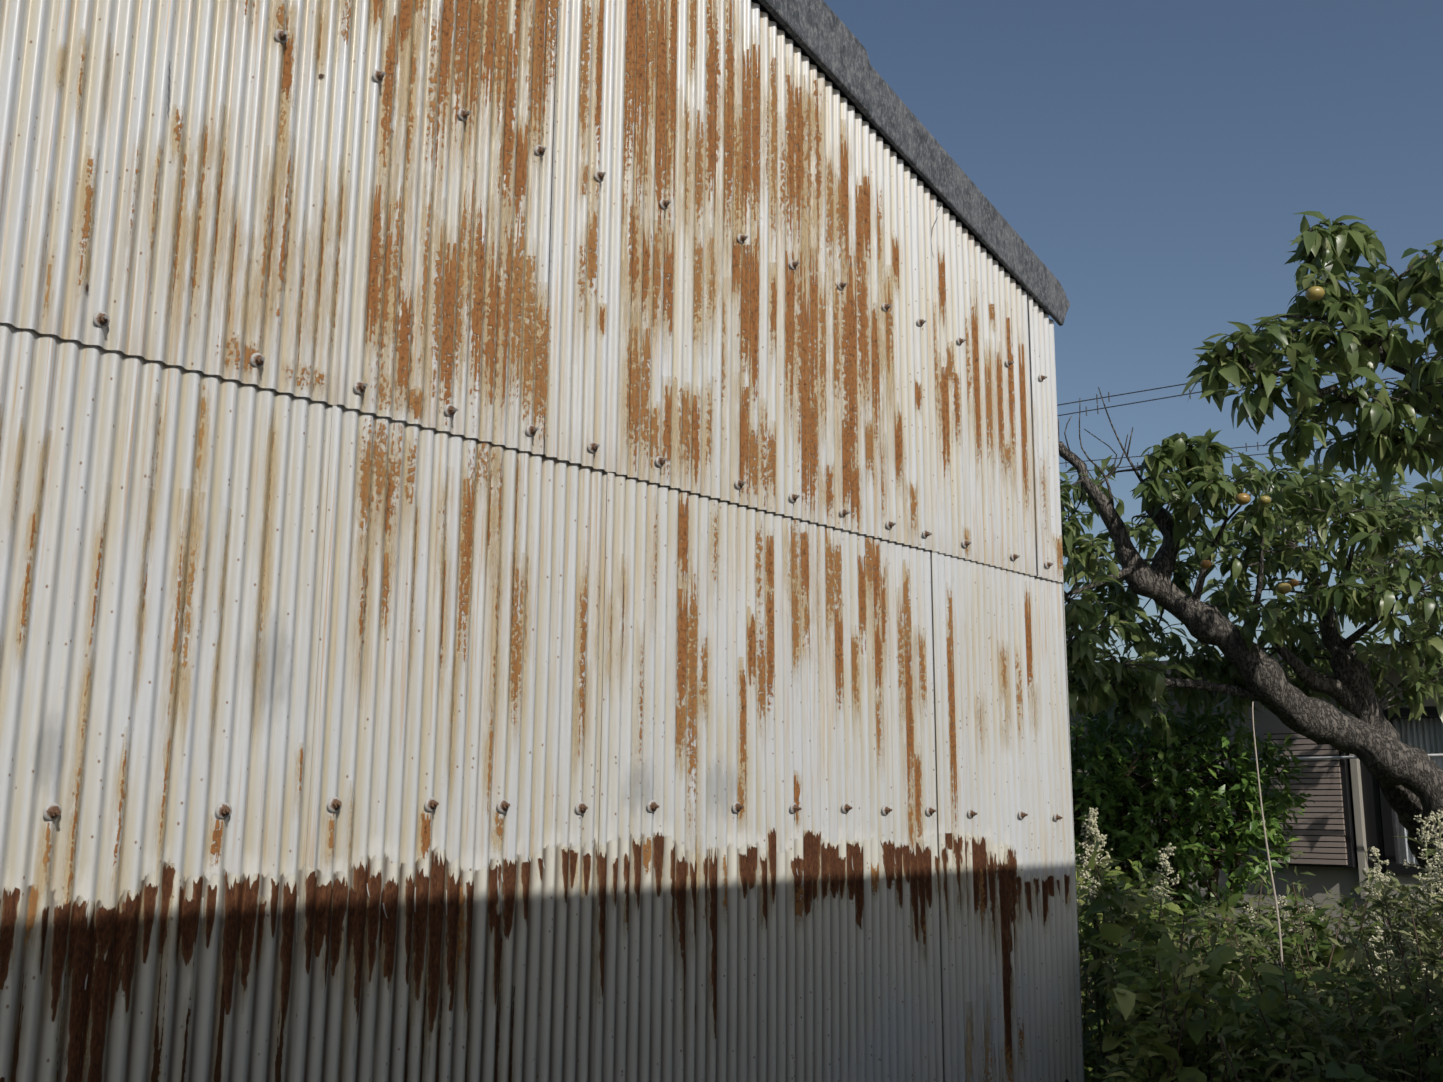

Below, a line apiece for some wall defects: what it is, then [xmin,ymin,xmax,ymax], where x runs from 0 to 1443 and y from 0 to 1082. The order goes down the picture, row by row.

rust [78,158,97,285]
rust [130,0,346,388]
rust [578,0,607,334]
rust [14,426,49,654]
rust [38,668,91,905]
rust [137,418,161,683]
rust [158,387,231,866]
rust [253,419,274,696]
rust [418,811,431,858]
rust [357,0,559,849]
rust [577,560,626,755]
rust [623,0,1063,898]